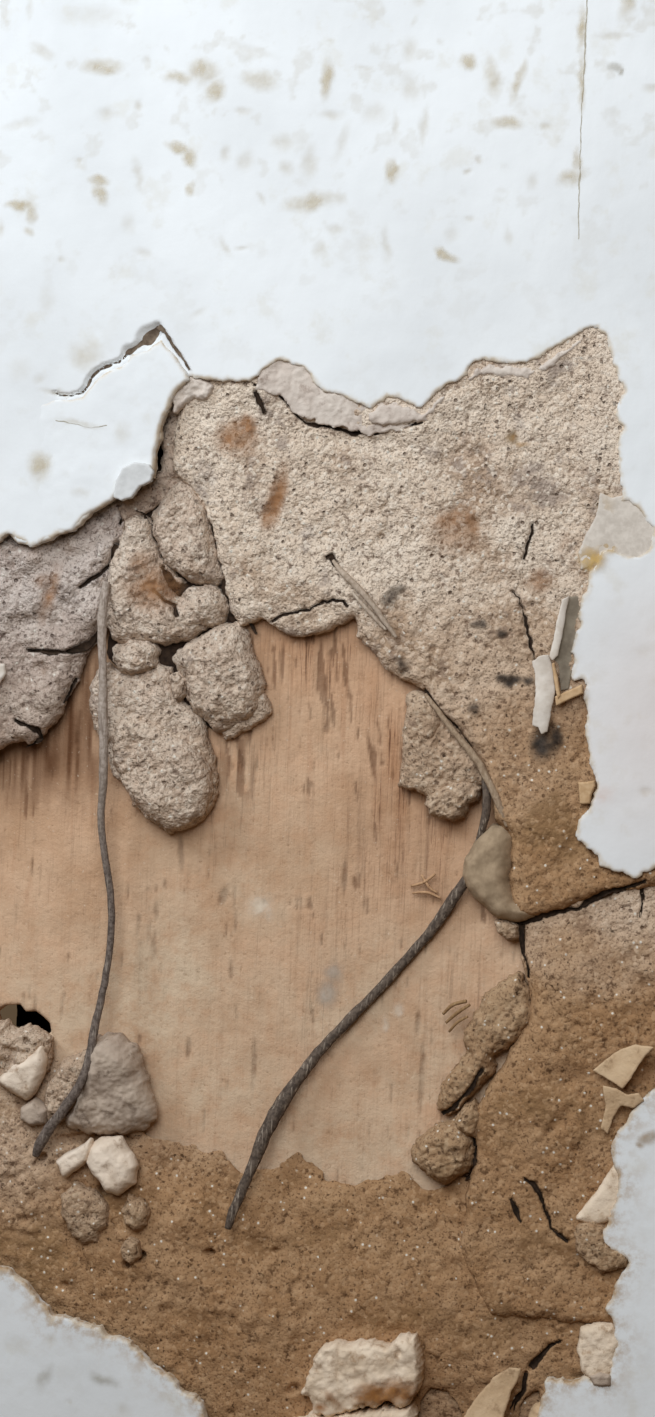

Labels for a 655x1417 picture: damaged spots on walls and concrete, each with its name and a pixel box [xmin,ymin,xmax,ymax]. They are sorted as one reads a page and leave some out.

crack [578,0,588,239]
crack [55,325,190,428]
crack [253,383,423,436]
crack [78,510,348,635]
crack [512,524,535,660]
crack [28,630,98,703]
crack [14,719,44,748]
flaking render [0,327,655,1417]
crack [516,880,646,978]
crack [510,1178,568,1243]